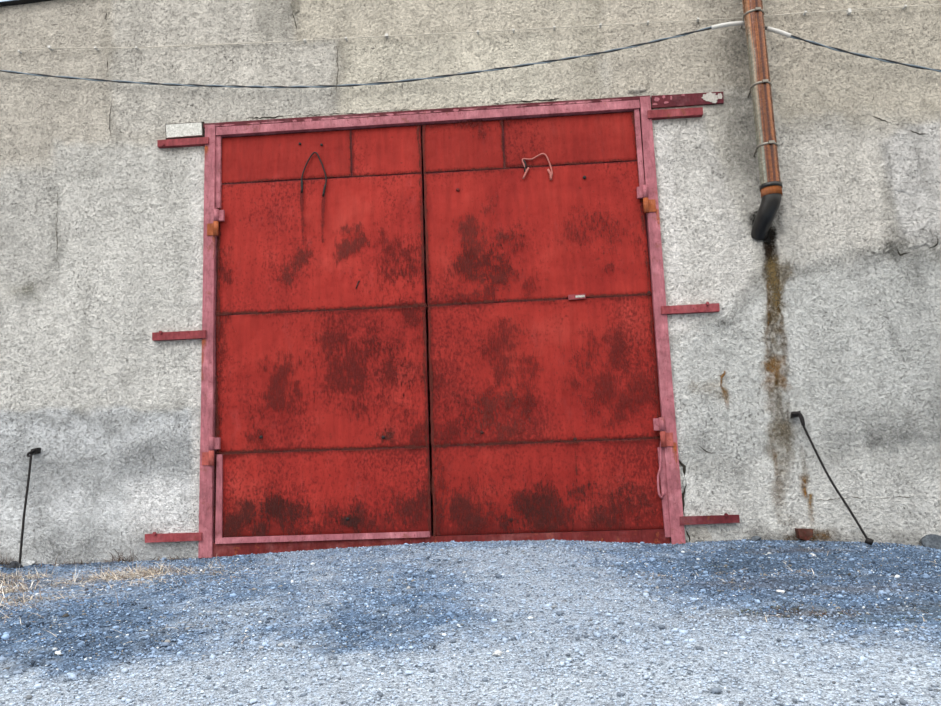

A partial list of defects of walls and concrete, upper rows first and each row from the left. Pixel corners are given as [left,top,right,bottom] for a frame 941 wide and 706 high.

corrosion [742,0,781,185]
corrosion [201,111,662,538]
corrosion [763,227,790,408]
corrosion [802,476,813,508]